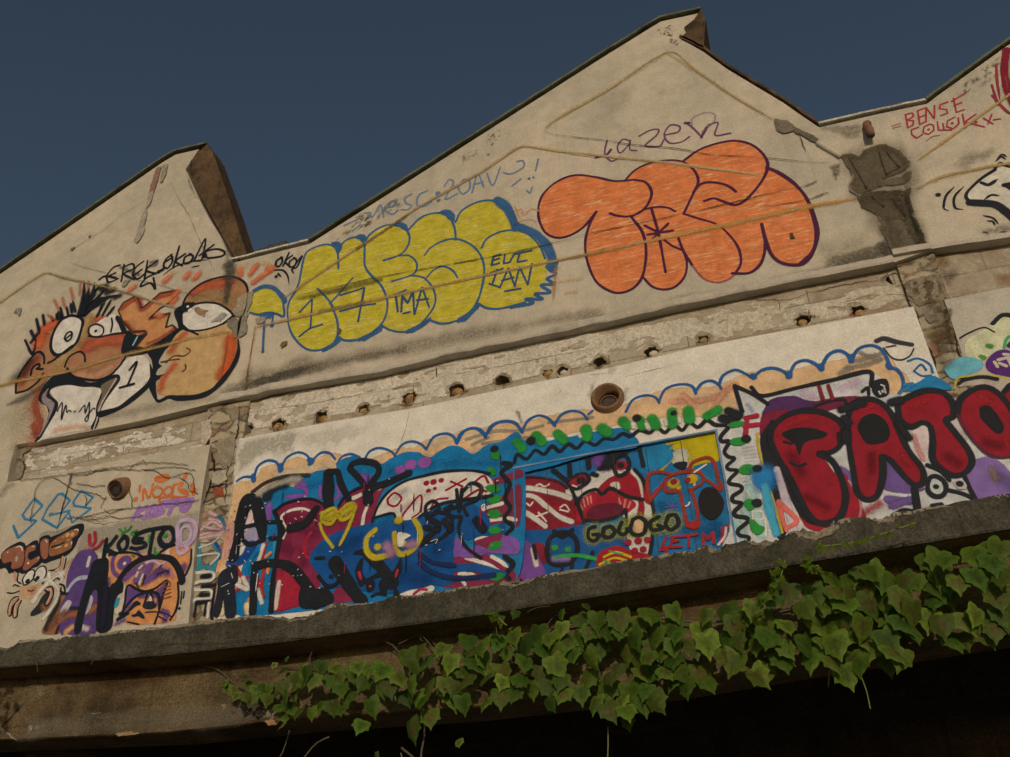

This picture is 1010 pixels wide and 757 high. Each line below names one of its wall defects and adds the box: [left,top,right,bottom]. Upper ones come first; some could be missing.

spalling [841,144,924,253]
crack [0,412,202,533]
peeling [13,270,948,594]